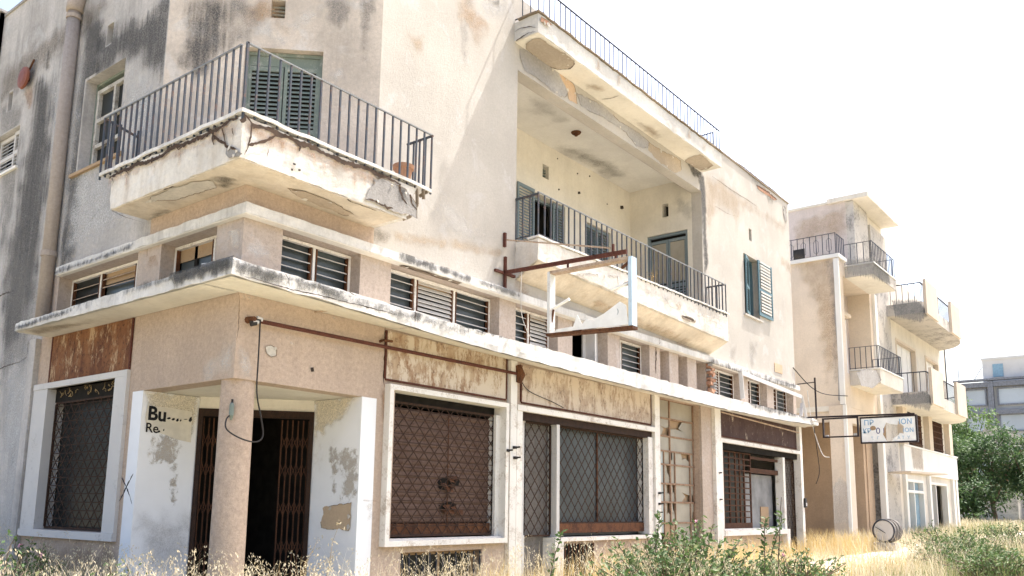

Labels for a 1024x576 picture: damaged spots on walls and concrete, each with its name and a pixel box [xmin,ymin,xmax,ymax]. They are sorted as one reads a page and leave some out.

leakage [185,1,243,74]
peeling [519,38,713,173]
spalling [365,178,417,218]
leakage [3,33,71,526]
corrosion [244,316,518,375]
peeling [153,436,178,503]
peeling [320,447,358,531]